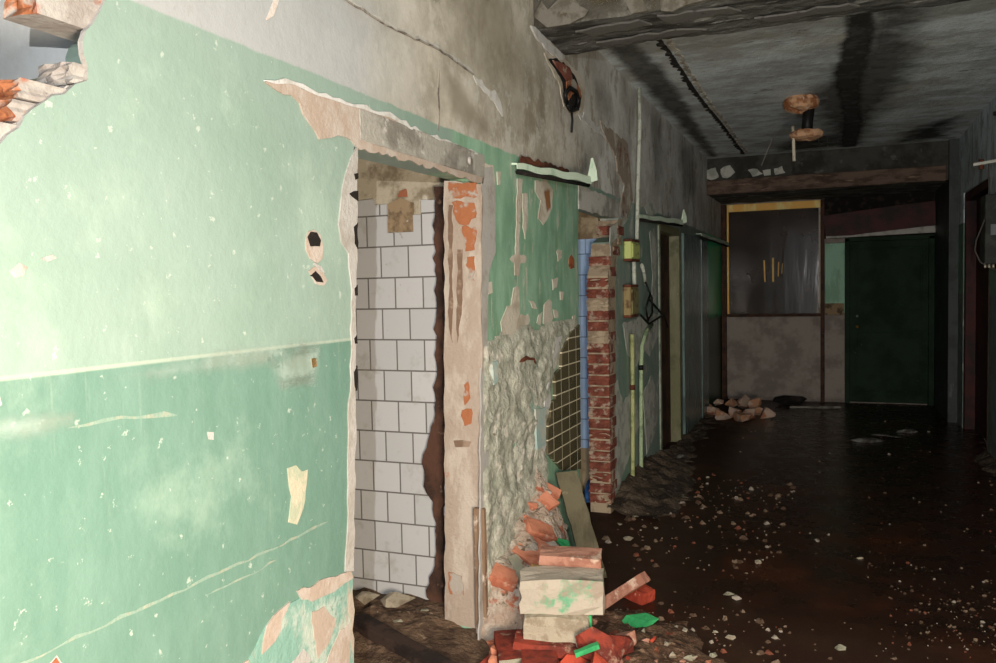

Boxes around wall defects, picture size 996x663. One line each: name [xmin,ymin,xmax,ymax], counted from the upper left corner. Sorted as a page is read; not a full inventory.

spalling [0,62,85,139]
spalling [3,0,101,43]
crack [266,0,279,20]
crack [345,0,503,130]
damp [780,8,918,151]
damp [903,119,954,141]
peeling [243,78,501,663]
flaking render [461,121,658,600]